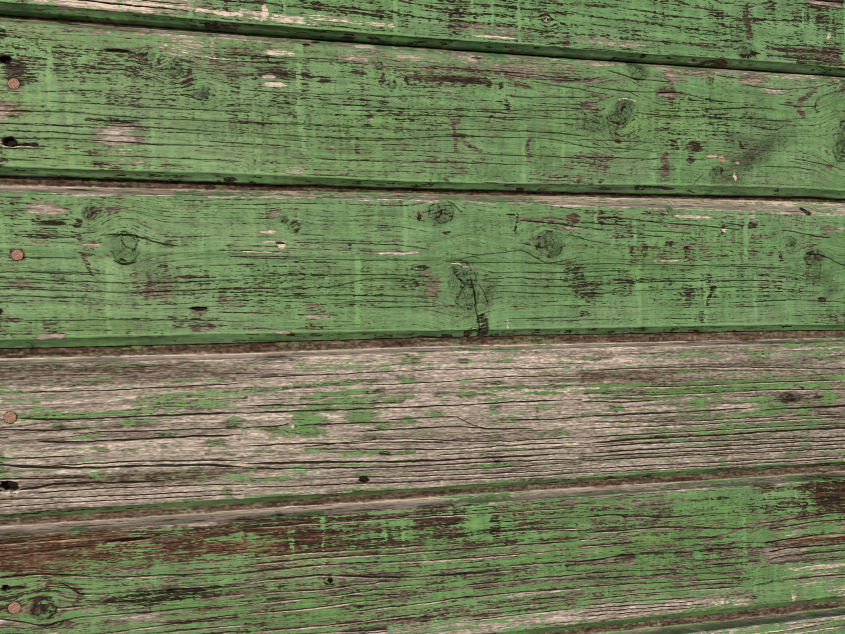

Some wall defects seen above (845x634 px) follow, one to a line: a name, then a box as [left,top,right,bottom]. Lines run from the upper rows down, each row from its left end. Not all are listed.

peeling [23,0,200,16]
peeling [58,48,135,70]
peeling [380,52,573,85]
peeling [779,40,845,66]
peeling [90,122,143,146]
peeling [167,306,220,330]
crack [463,281,489,336]
peeling [413,513,466,545]
peeling [757,534,845,559]
peeling [0,585,33,612]
peeling [93,585,230,626]
peeling [544,596,728,624]